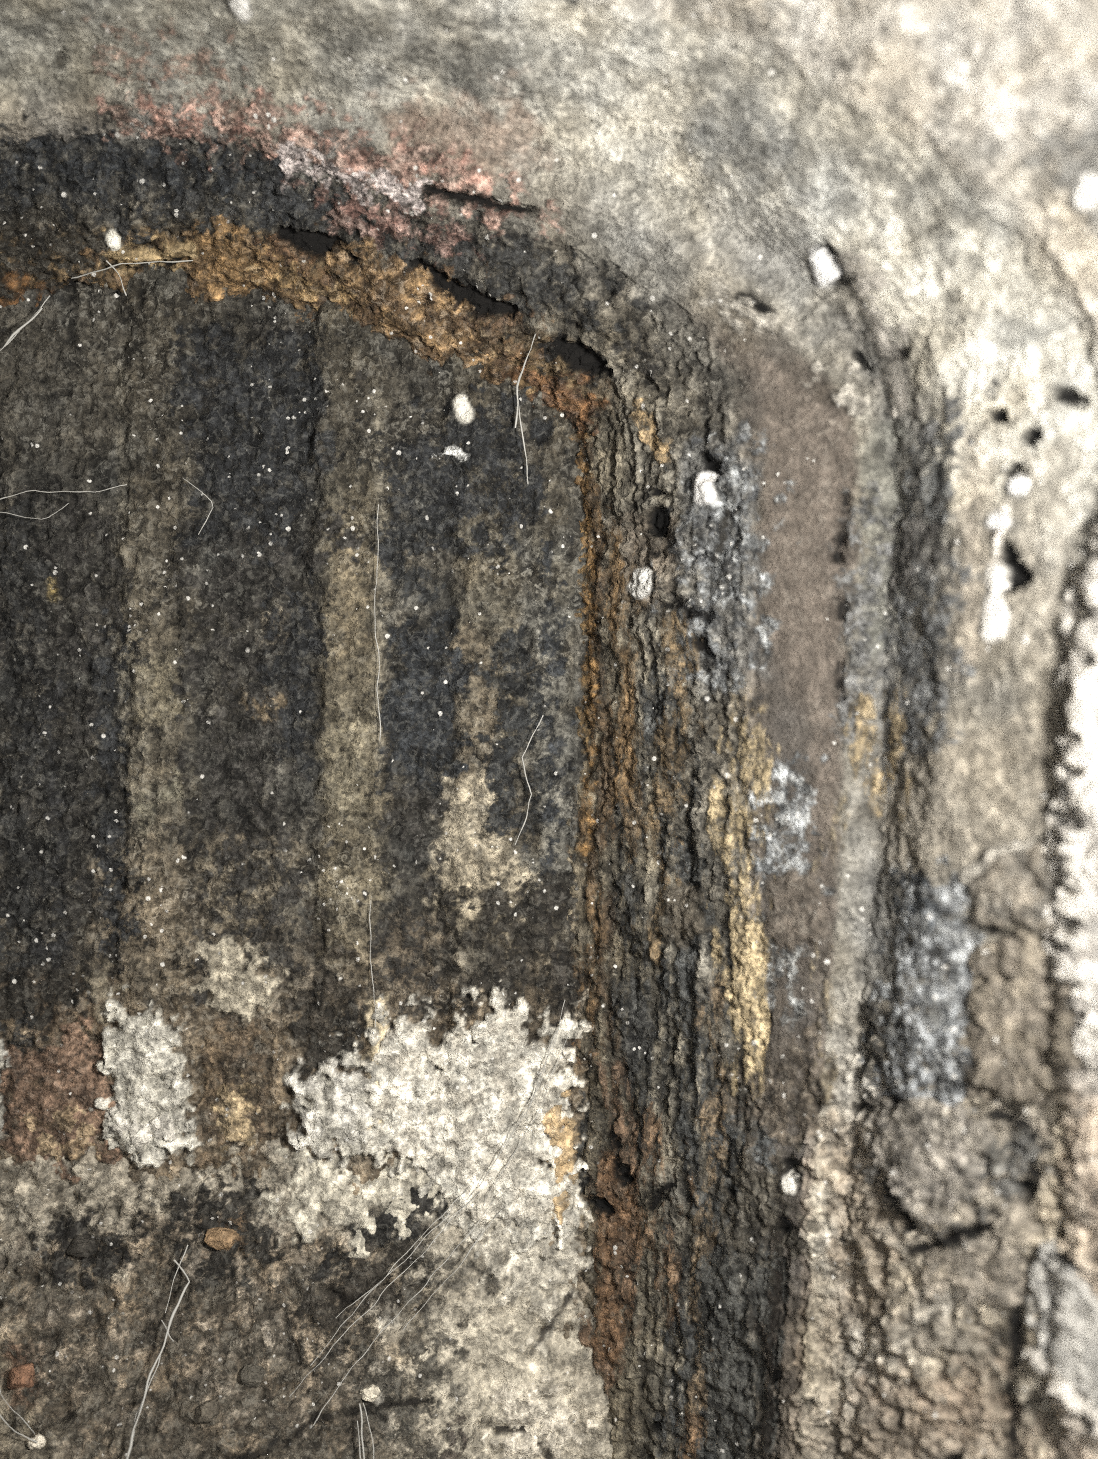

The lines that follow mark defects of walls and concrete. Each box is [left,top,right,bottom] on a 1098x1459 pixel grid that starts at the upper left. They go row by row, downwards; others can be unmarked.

rust [0,272,44,308]
water stain [0,111,662,390]
water stain [0,306,823,1459]
rust [78,215,772,1459]